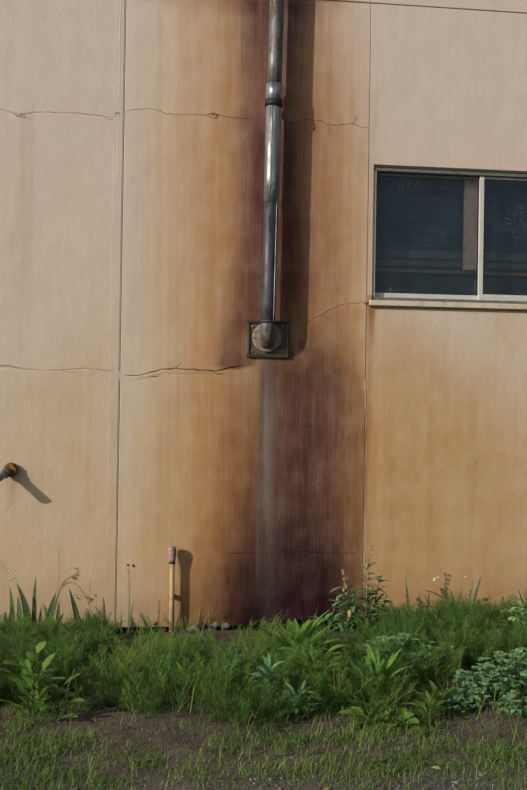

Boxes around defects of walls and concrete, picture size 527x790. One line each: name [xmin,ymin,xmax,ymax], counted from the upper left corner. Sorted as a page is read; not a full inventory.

crack [125,108,257,122]
crack [124,364,245,380]